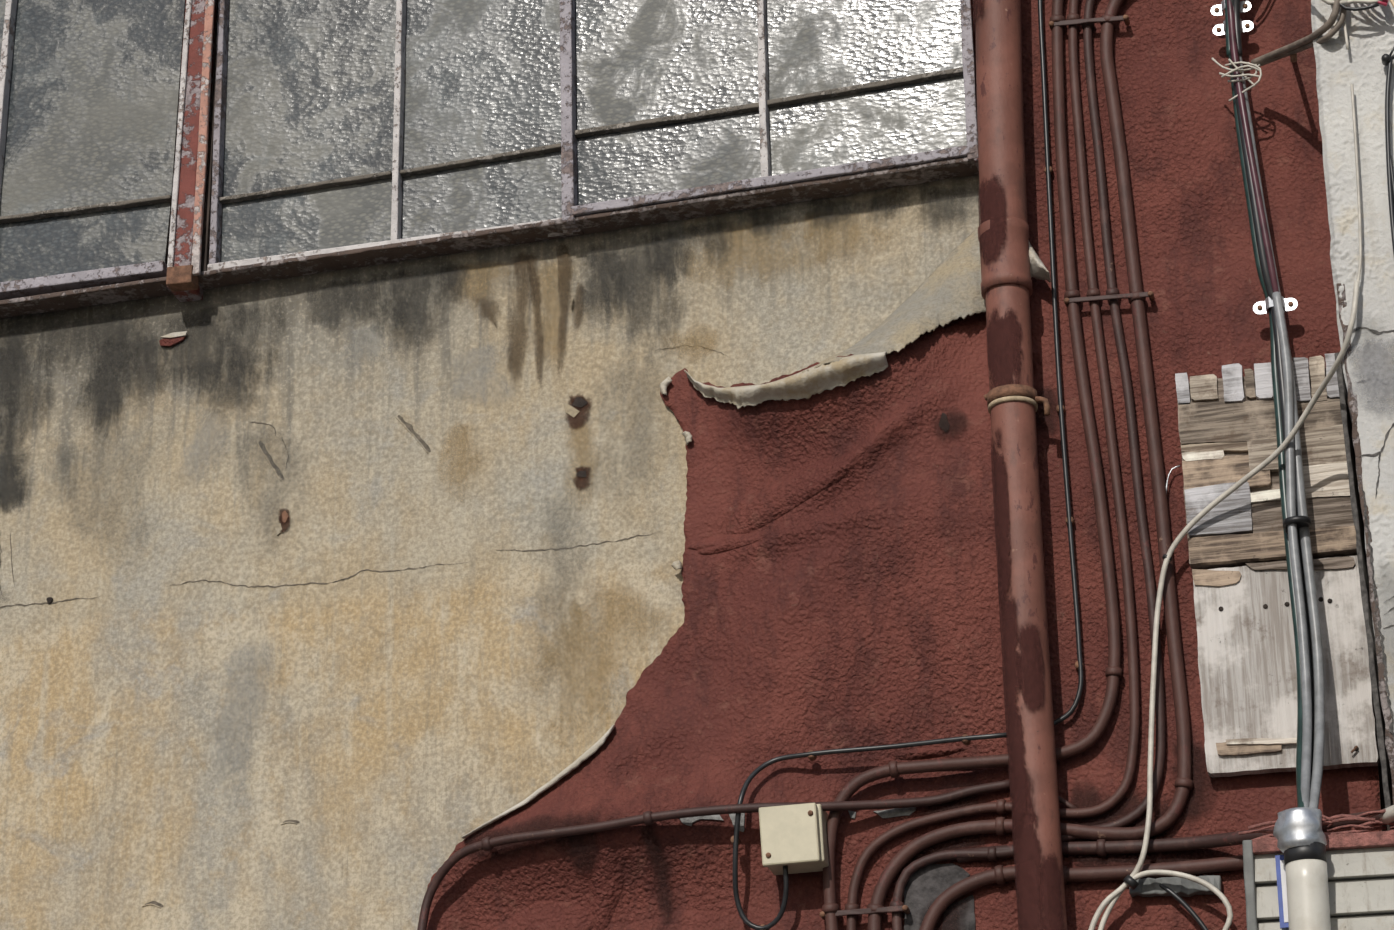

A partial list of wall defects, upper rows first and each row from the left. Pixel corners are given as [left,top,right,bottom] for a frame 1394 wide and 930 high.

peeling [1029,242,1051,283]
water stain [173,308,271,401]
water stain [316,265,464,337]
water stain [482,233,678,379]
crack [1353,327,1394,335]
water stain [0,311,160,507]
spalling [257,440,284,481]
spalling [396,415,431,454]
corrosion [567,395,590,428]
corrosion [574,467,591,489]
peeling [417,228,1019,930]
crack [1359,423,1394,746]